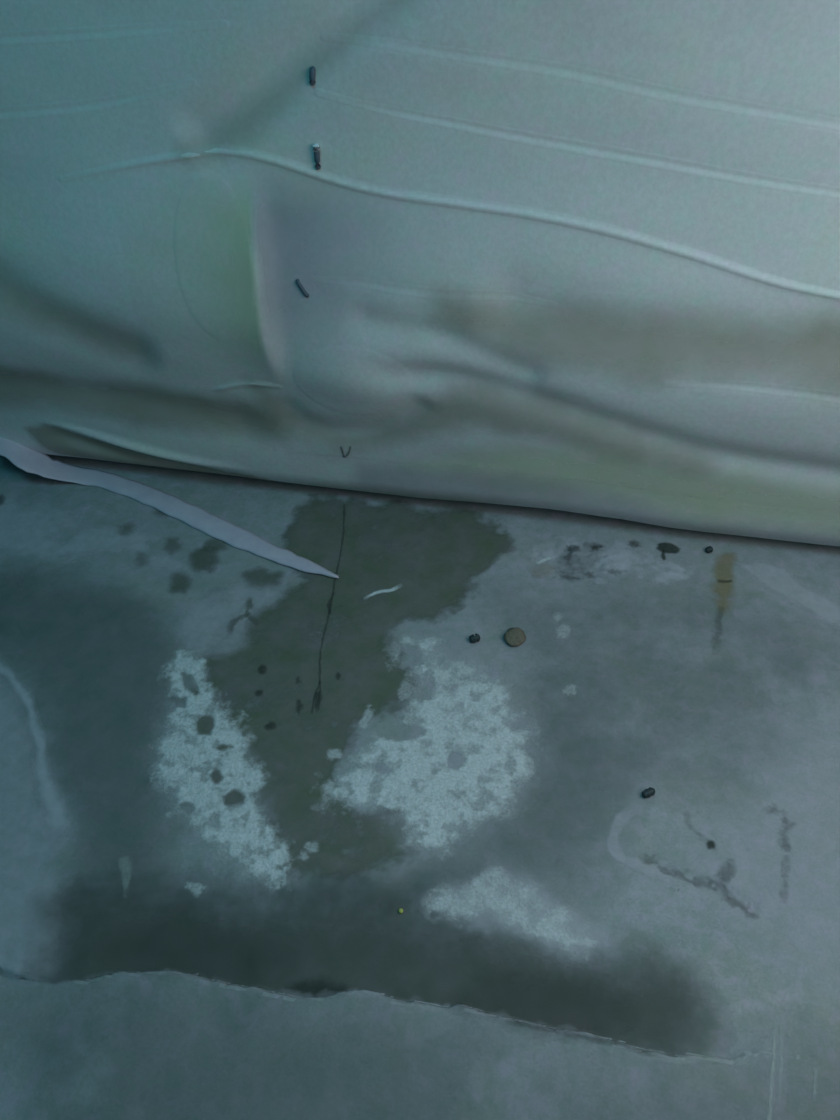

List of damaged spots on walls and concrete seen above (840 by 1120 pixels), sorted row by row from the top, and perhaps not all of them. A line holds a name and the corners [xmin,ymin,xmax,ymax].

peeling [0,437,339,579]
damp [0,493,693,1055]